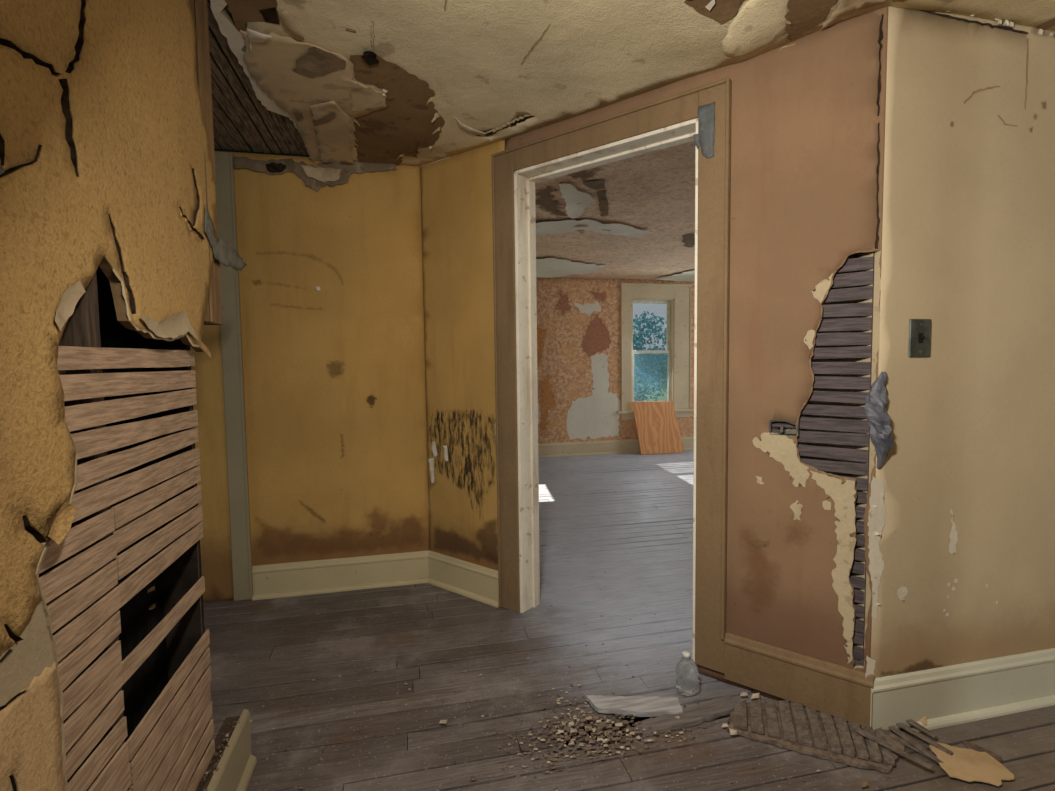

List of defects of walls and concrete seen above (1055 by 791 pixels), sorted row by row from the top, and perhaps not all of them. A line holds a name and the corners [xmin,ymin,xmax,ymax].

crack [0,0,86,178]
spalling [207,0,336,155]
crack [923,11,1053,126]
flaking render [682,233,695,247]
flaking render [566,353,621,440]
leakage [429,411,495,505]
spalling [749,250,885,678]
spalling [0,268,215,791]
leakage [436,522,498,562]
crack [0,623,24,662]
crack [0,691,26,711]
crack [9,775,18,791]